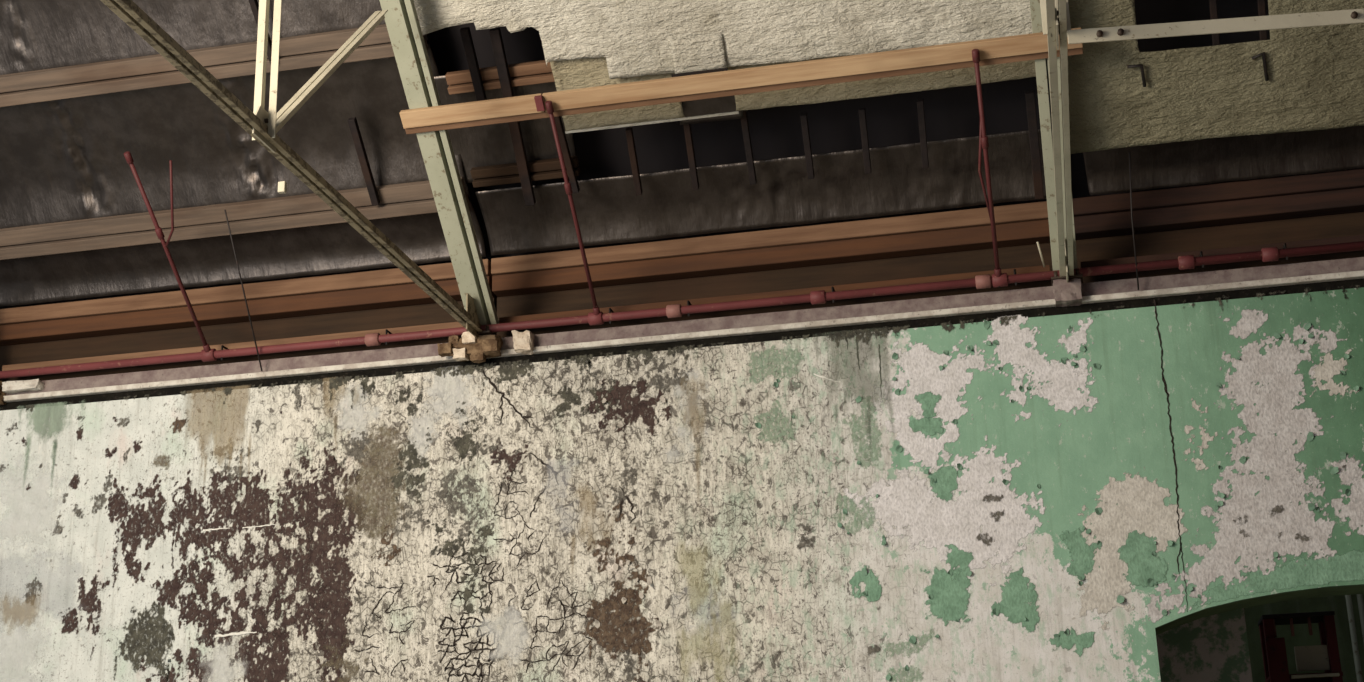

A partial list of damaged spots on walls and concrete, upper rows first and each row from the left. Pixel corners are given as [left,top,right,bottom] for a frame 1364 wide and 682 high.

crack [354,370,592,682]
flaking render [582,535,662,682]
flaking render [587,379,671,449]
peeling [838,315,1101,586]
crack [1153,299,1188,607]
peeling [1054,309,1364,640]